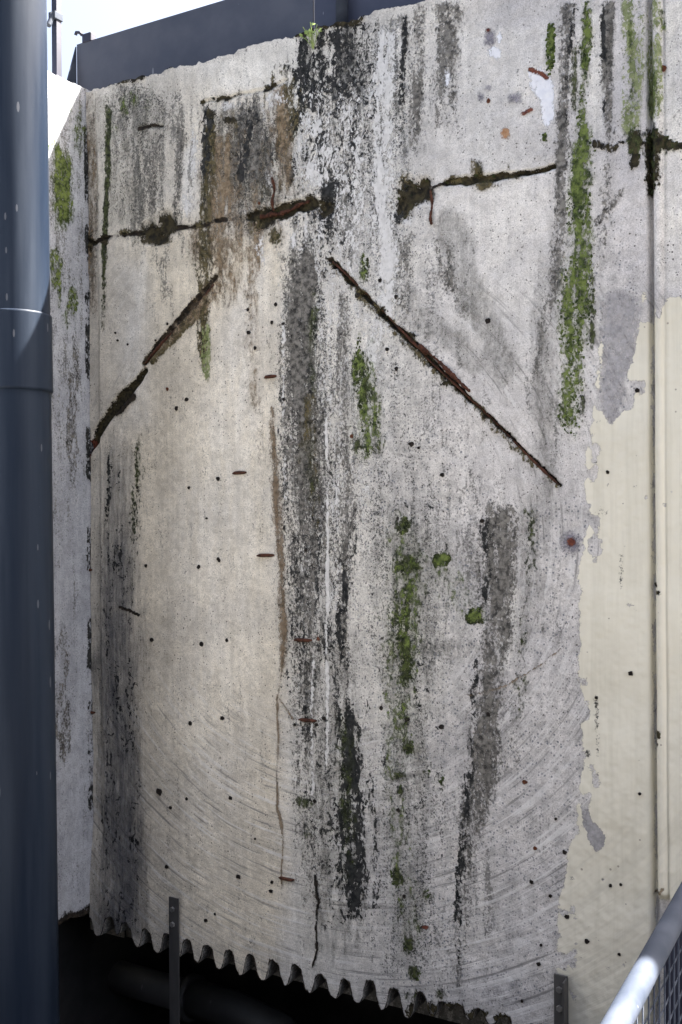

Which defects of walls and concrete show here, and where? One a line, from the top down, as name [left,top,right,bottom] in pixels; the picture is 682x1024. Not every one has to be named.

water stain [56,434,147,934]
water stain [62,84,146,488]
crack [88,212,241,251]
water stain [128,0,465,927]
water stain [433,238,473,316]
crack [432,158,557,191]
water stain [453,502,537,976]
water stain [532,0,579,378]
peeling [556,297,682,1024]